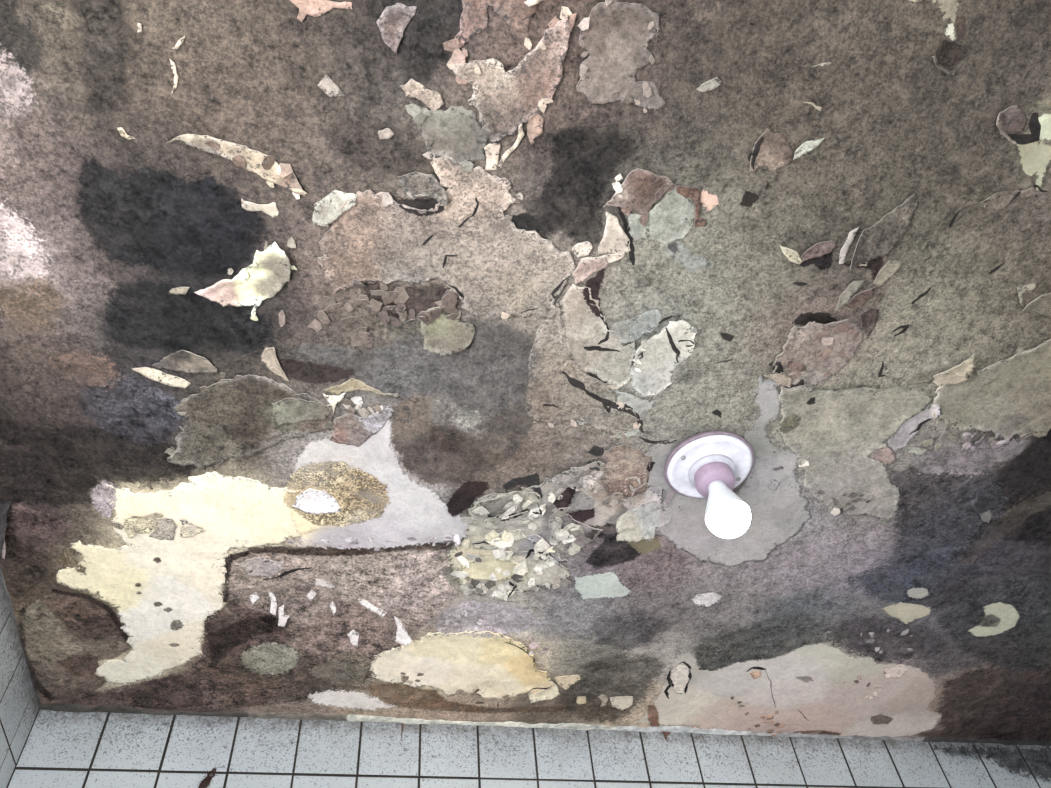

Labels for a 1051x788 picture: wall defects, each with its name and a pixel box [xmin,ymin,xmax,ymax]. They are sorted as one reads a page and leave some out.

peeling [167,134,307,199]
spalling [980,97,1051,210]
water stain [69,153,278,358]
peeling [168,237,297,321]
peeling [307,0,722,440]
crack [892,287,932,337]
water stain [285,317,539,419]
crack [878,361,886,377]
spalling [56,260,1051,707]
water stain [693,429,1051,783]
spalling [308,690,395,711]
spalling [634,643,942,737]